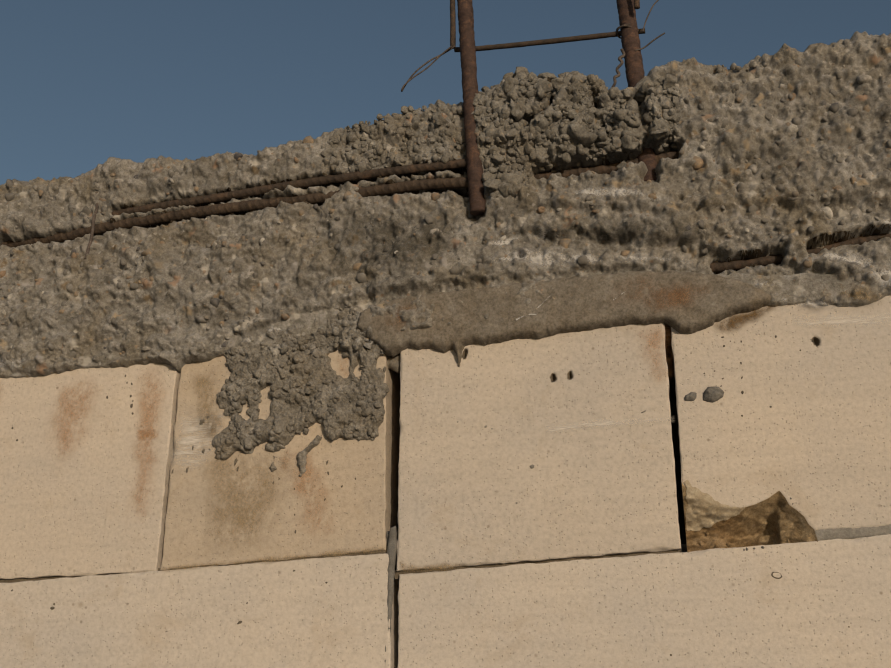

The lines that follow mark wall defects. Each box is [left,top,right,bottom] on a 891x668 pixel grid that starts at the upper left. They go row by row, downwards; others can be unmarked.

spalling [721,58,796,107]
spalling [0,150,477,330]
spalling [533,154,639,216]
spalling [655,83,740,209]
spalling [682,154,891,274]
spalling [811,136,891,225]
peeling [265,442,286,484]
peeling [296,435,322,477]
spalling [682,480,818,552]